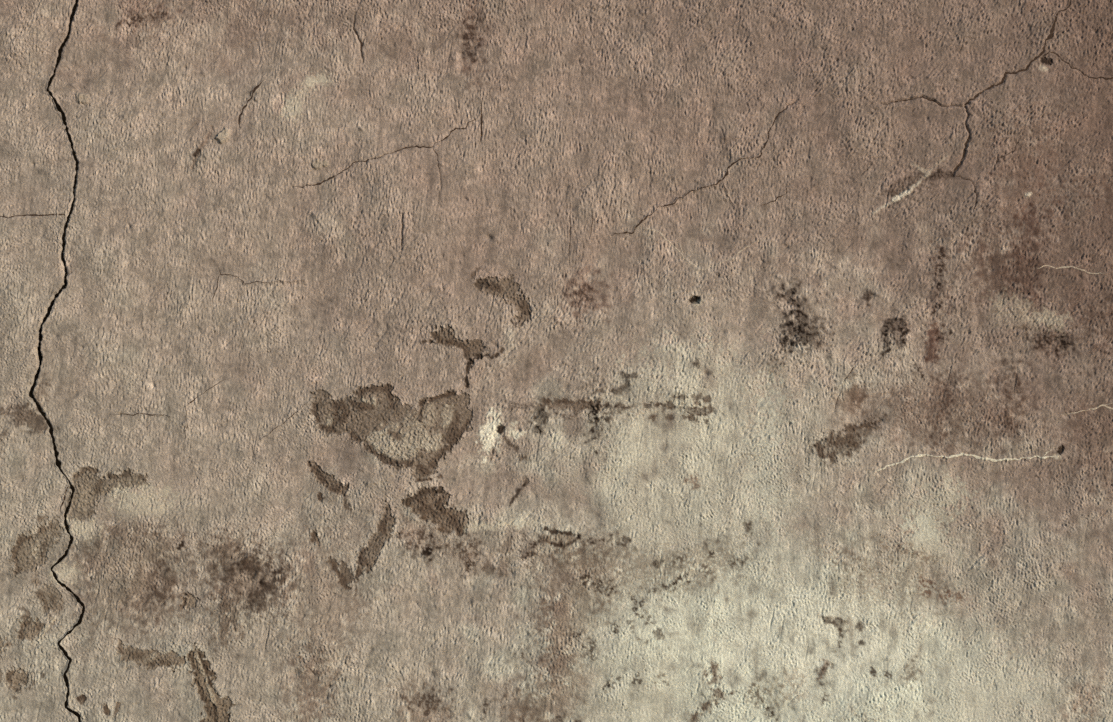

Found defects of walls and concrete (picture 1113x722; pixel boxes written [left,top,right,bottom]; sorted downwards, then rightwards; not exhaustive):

crack [0,0,85,722]
crack [883,2,1113,211]